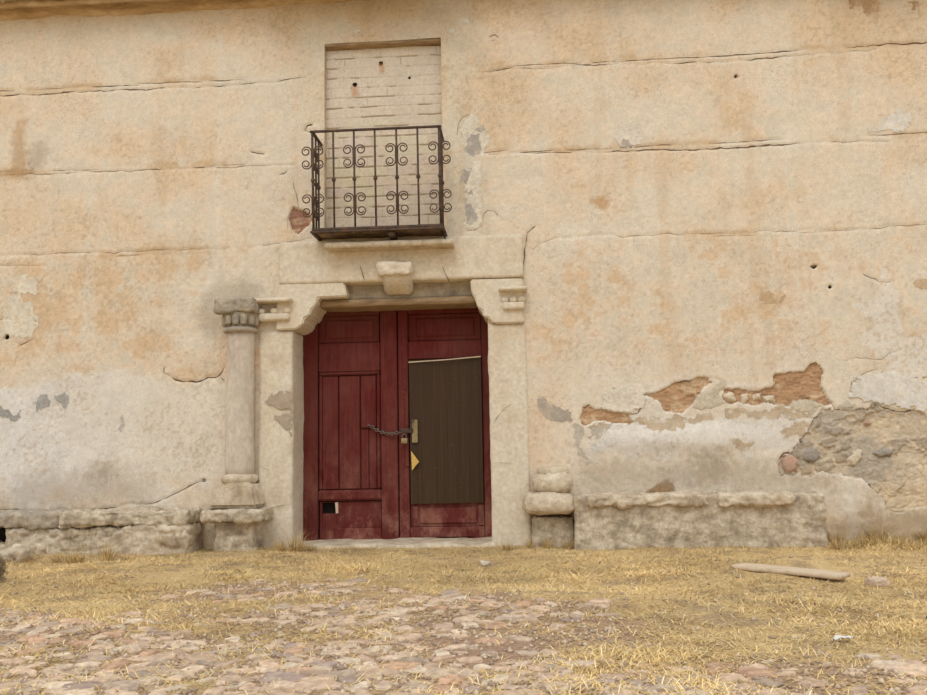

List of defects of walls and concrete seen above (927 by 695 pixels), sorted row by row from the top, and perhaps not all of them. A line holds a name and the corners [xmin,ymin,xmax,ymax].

crack [0,82,171,96]
crack [485,147,584,155]
crack [612,139,795,152]
peeling [459,113,491,232]
flaking render [289,208,312,234]
peeling [0,407,21,422]
peeling [34,392,69,413]
peeling [265,390,294,436]
flaking render [537,364,927,514]